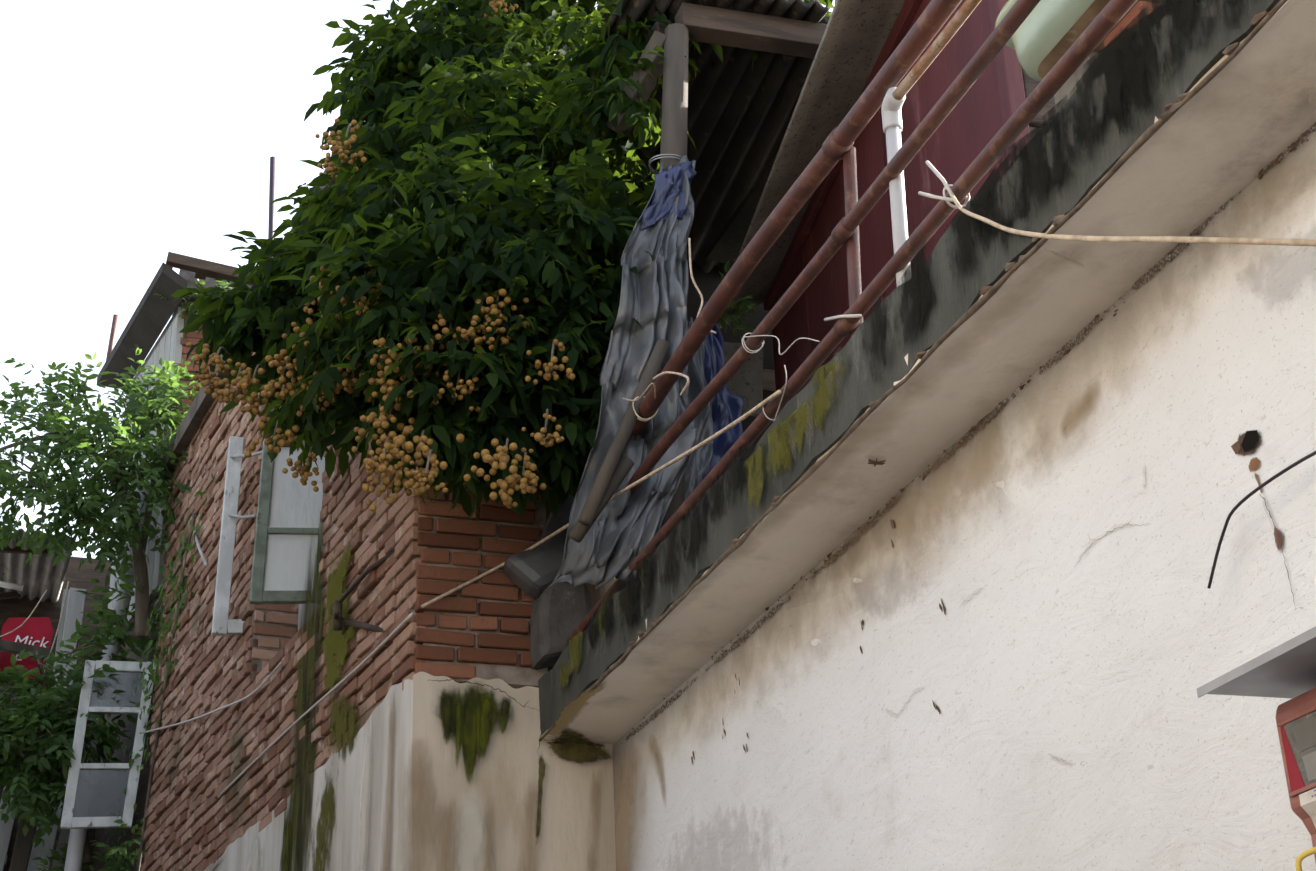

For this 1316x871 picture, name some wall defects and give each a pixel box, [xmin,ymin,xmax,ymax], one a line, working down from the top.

damp [950,0,1241,275]
damp [863,242,933,377]
corrosion [1249,457,1262,493]
damp [281,523,369,871]
damp [383,709,393,871]
damp [411,766,489,871]
damp [441,693,510,781]
damp [526,371,834,871]